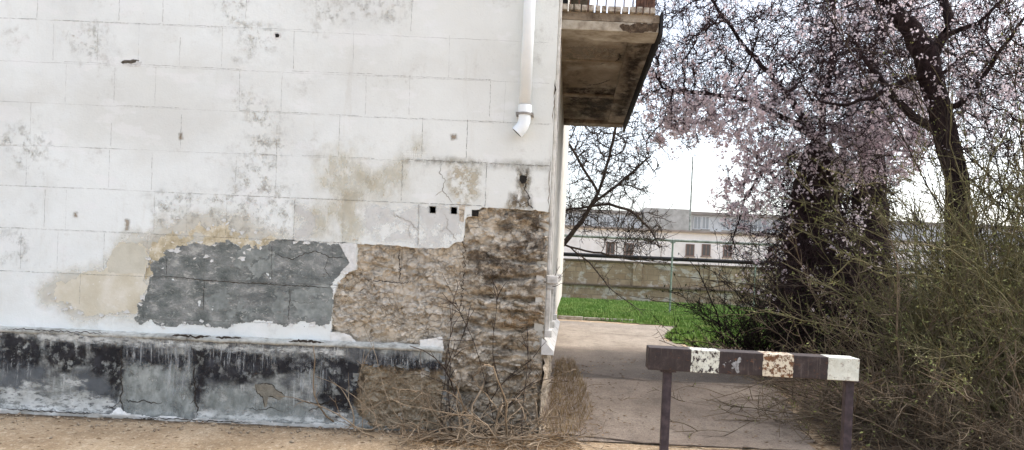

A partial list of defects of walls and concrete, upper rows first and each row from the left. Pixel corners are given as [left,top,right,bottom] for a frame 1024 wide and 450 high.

damp [568,43,649,118]
crack [516,156,551,217]
peeling [41,177,349,329]
crack [362,168,466,330]
damp [0,332,345,357]
damp [0,374,118,414]
spalling [0,357,452,430]
damp [197,409,356,425]